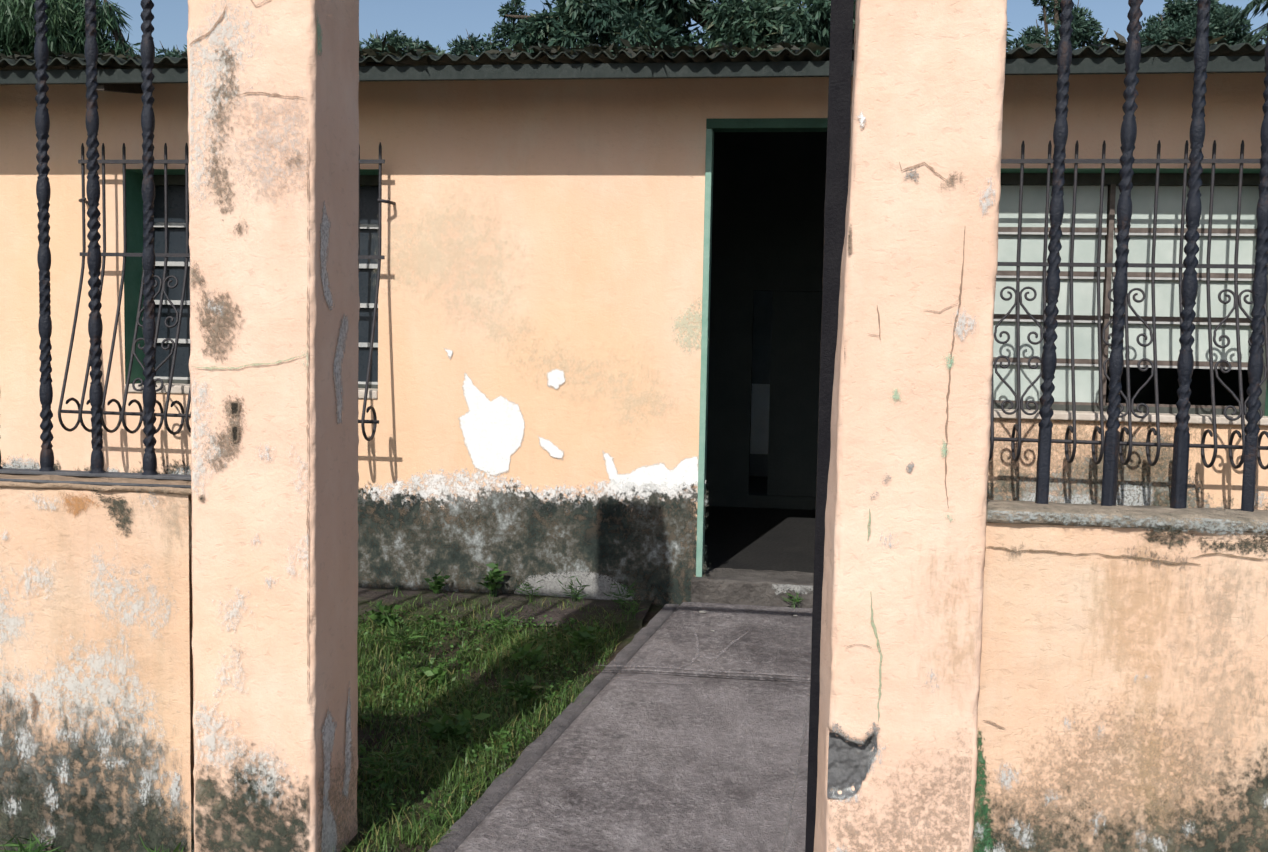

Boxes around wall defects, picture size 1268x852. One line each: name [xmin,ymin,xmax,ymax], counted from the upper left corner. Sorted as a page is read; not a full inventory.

water stain [205,50,247,234]
water stain [190,266,241,361]
water stain [204,395,244,471]
peeling [320,201,349,424]
peeling [359,372,706,509]
water stain [358,480,709,606]
peeling [547,368,566,390]
crack [985,545,1268,568]
water stain [987,419,1268,557]
water stain [0,687,356,852]
spalling [827,723,885,802]
water stain [831,705,1268,852]